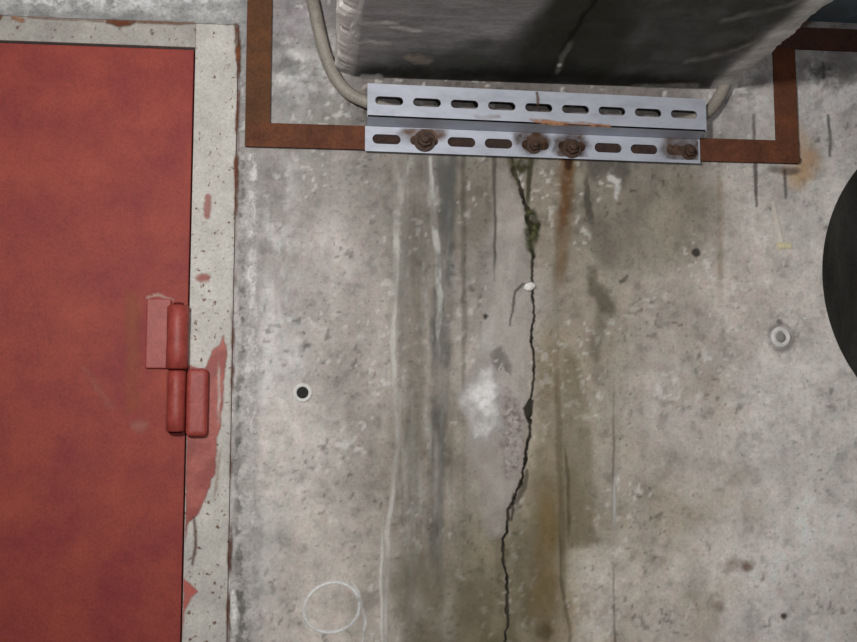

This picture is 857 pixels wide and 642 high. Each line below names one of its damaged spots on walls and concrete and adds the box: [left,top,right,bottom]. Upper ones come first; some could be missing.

spalling [183,152,261,642]
leakage [379,482,395,642]
leakage [435,269,443,341]
leakage [429,155,454,254]
leakage [459,172,528,534]
crack [501,157,540,642]